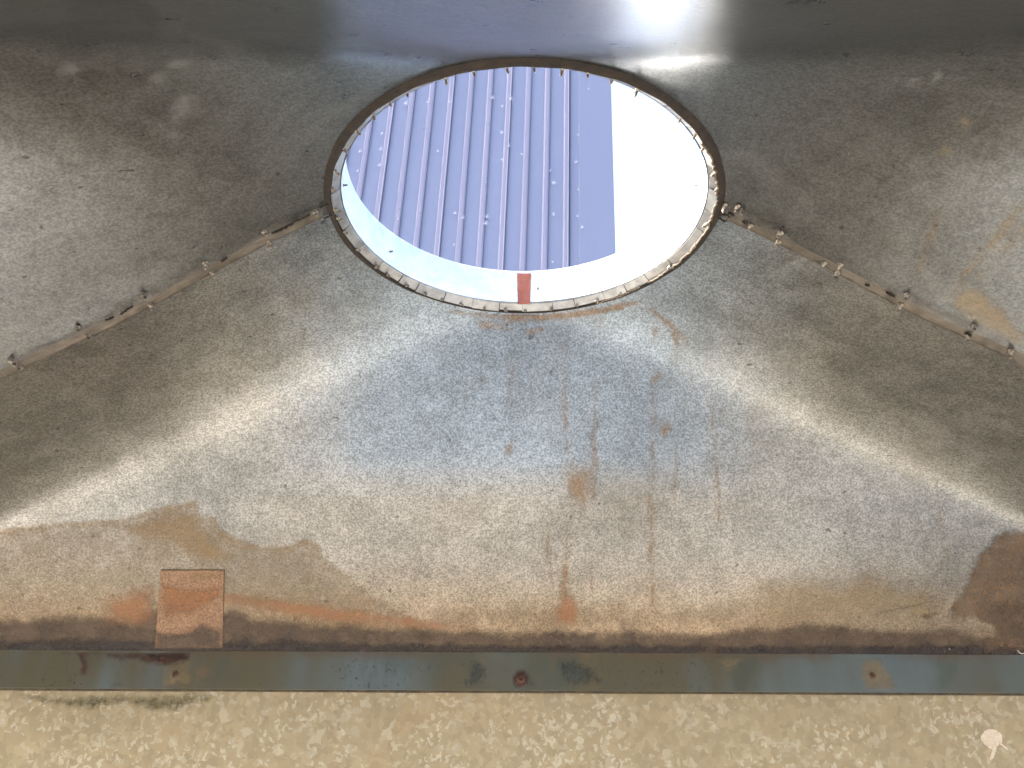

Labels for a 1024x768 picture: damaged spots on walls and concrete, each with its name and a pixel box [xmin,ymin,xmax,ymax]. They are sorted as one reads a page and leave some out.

corrosion [0,532,1024,676]